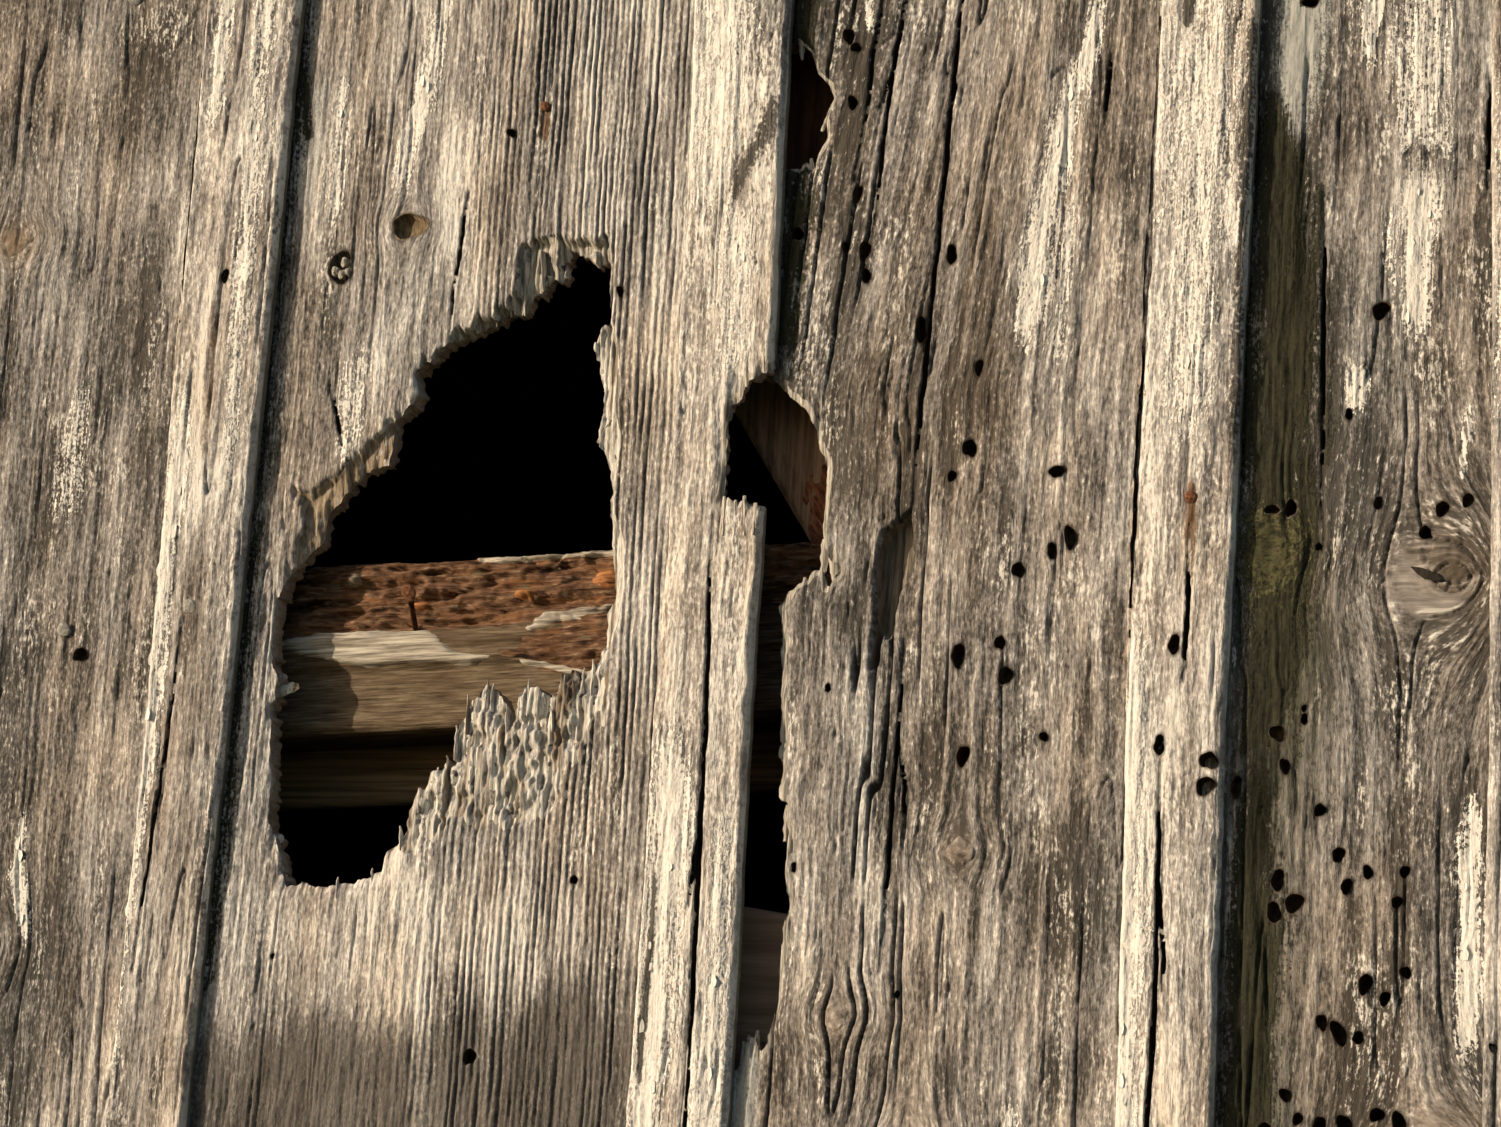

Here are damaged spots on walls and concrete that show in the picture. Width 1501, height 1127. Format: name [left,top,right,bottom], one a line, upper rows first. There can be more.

spalling [276,673,300,698]
spalling [290,342,396,578]
spalling [395,327,624,855]
spalling [425,237,613,364]
crack [682,514,714,1127]
peeling [626,0,844,1127]
crack [1128,0,1161,647]
crack [1142,758,1166,1127]
corrosion [1184,481,1198,584]